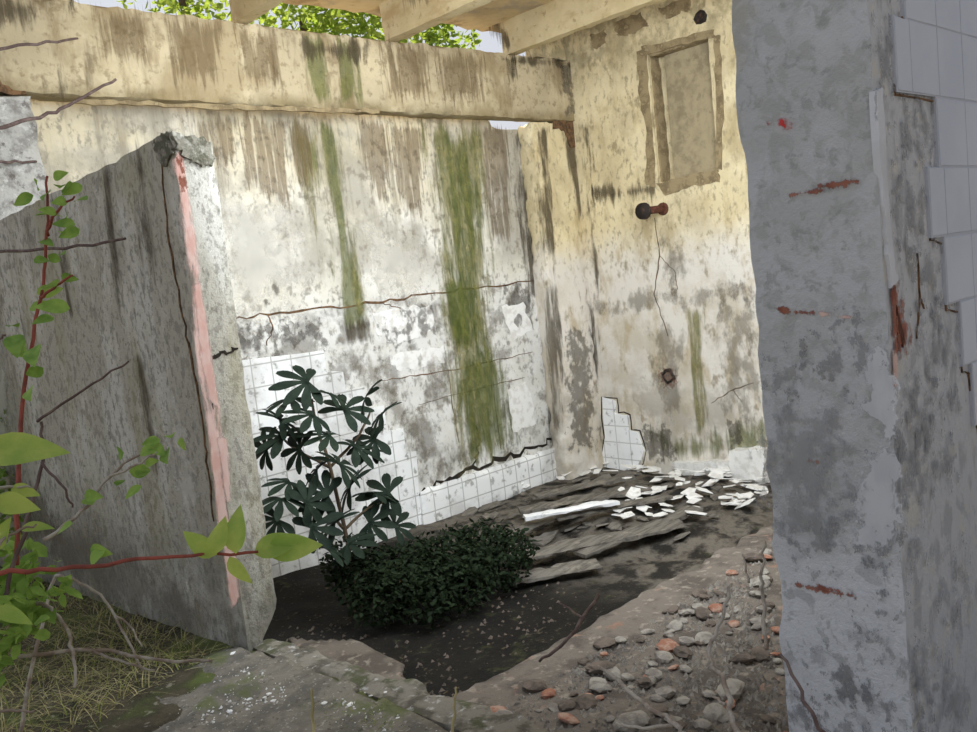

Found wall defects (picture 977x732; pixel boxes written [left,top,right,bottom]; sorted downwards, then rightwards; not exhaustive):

water stain [0,0,32,23]
water stain [302,37,368,98]
spalling [153,131,216,167]
corrosion [789,180,859,198]
water stain [295,124,370,342]
water stain [421,125,513,461]
crack [161,165,238,522]
corrosion [175,153,230,523]
spalling [896,305,905,348]
crack [382,369,552,496]
corrosion [224,545,239,605]
corrosion [795,581,856,599]